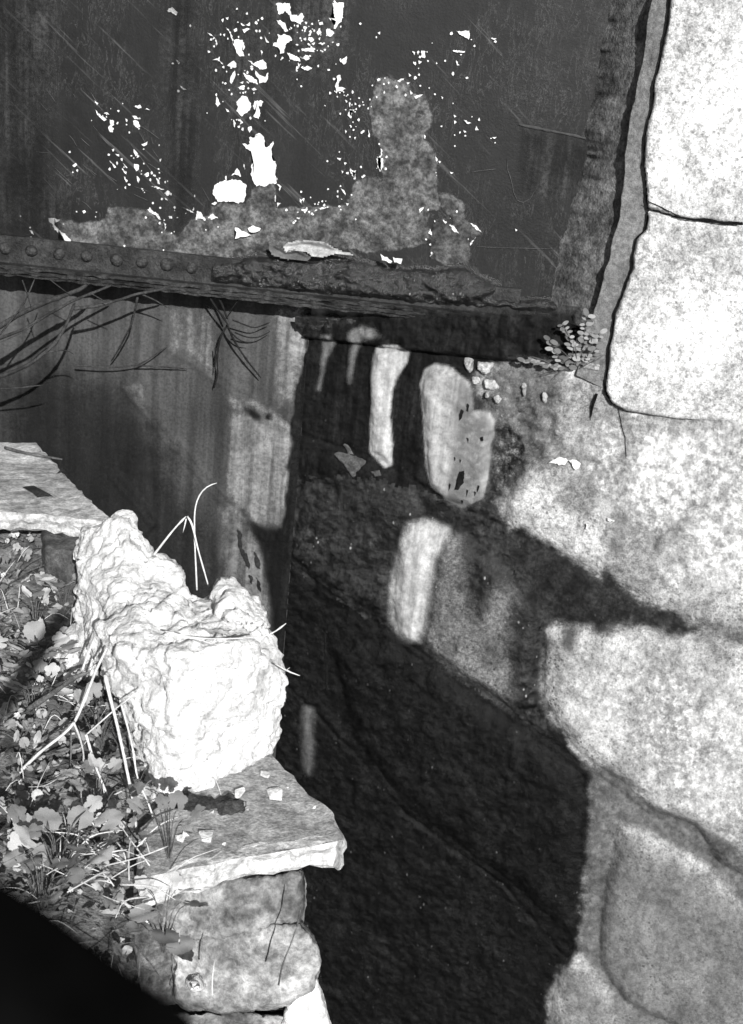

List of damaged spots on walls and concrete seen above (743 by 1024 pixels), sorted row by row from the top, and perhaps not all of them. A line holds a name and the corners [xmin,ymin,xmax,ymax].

peeling [91,101,149,133]
peeling [108,0,480,234]
corrosion [56,77,557,312]
peeling [49,218,71,241]
peeling [235,225,261,239]
peeling [419,207,481,256]
crack [590,0,743,452]